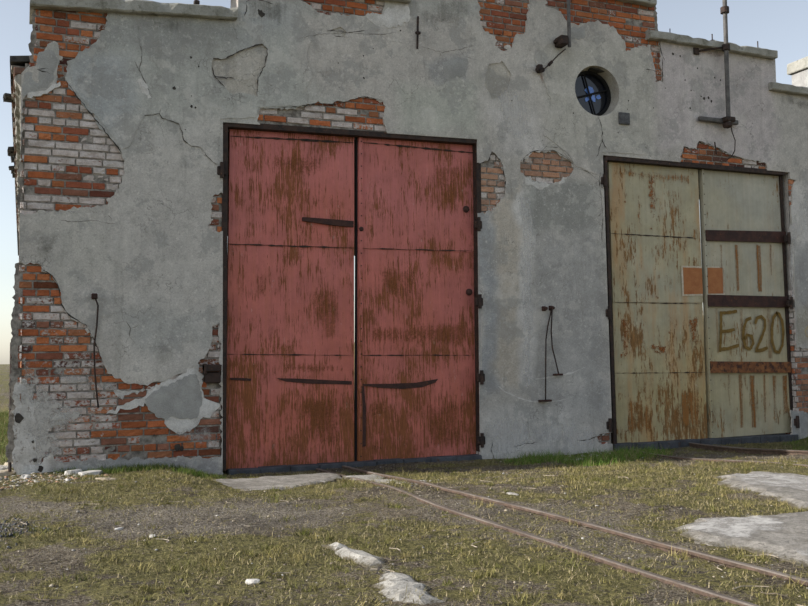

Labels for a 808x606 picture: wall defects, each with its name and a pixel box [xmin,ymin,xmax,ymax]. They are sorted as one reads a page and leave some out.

peeling [211,44,267,96]
flaking render [301,0,384,16]
peeling [485,61,512,101]
flaking render [478,0,530,51]
flaking render [545,0,666,89]
flaking render [16,9,125,215]
crack [145,110,216,164]
flaking render [257,97,386,132]
flaking render [481,153,506,213]
flaking render [520,151,573,184]
flaking render [680,141,766,169]
flaking render [5,263,221,472]